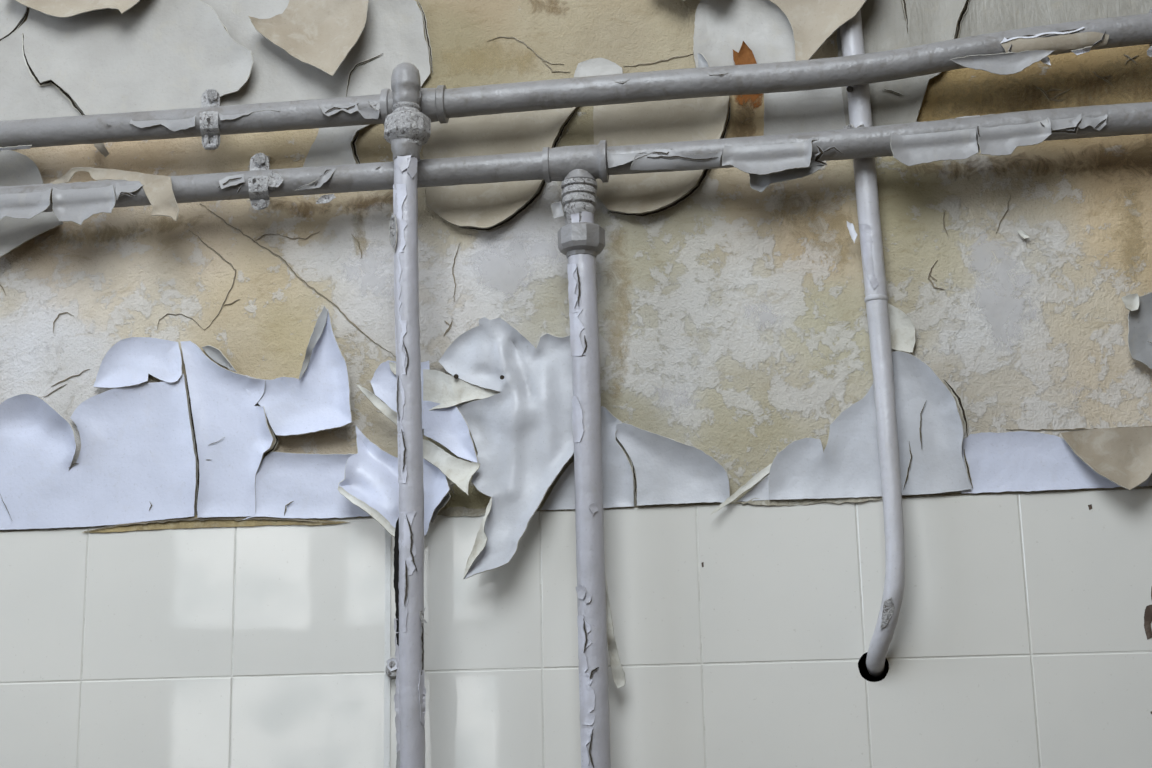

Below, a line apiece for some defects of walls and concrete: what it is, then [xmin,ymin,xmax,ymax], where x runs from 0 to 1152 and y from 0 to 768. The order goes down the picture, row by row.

peeling [0,0,433,204]
peeling [574,58,623,77]
peeling [693,0,970,68]
peeling [593,72,1108,217]
peeling [950,27,1109,75]
crack [157,177,409,470]
crack [444,244,460,335]
peeling [0,107,585,768]
peeling [589,384,882,515]
peeling [888,292,1152,496]
spalling [1144,587,1152,640]